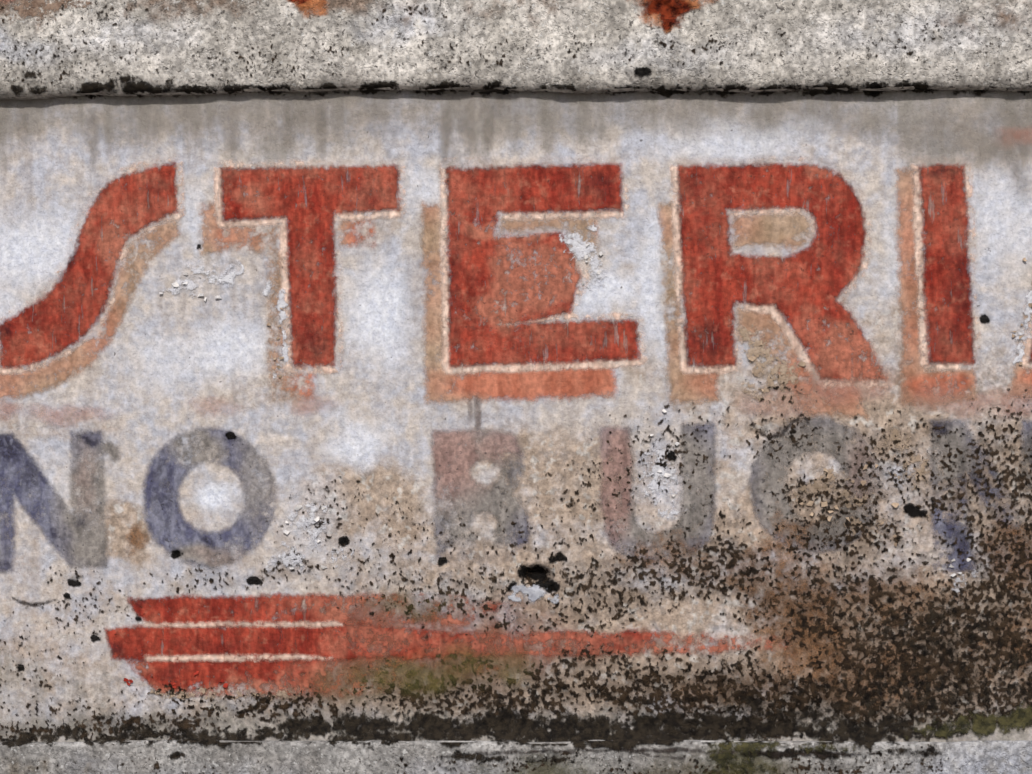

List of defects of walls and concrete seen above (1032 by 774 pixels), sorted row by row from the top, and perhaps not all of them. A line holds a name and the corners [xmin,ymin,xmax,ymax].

rust [288,0,327,17]
rust [642,0,712,32]
peeling [559,224,607,290]
peeling [159,262,244,302]
hole [507,552,567,604]